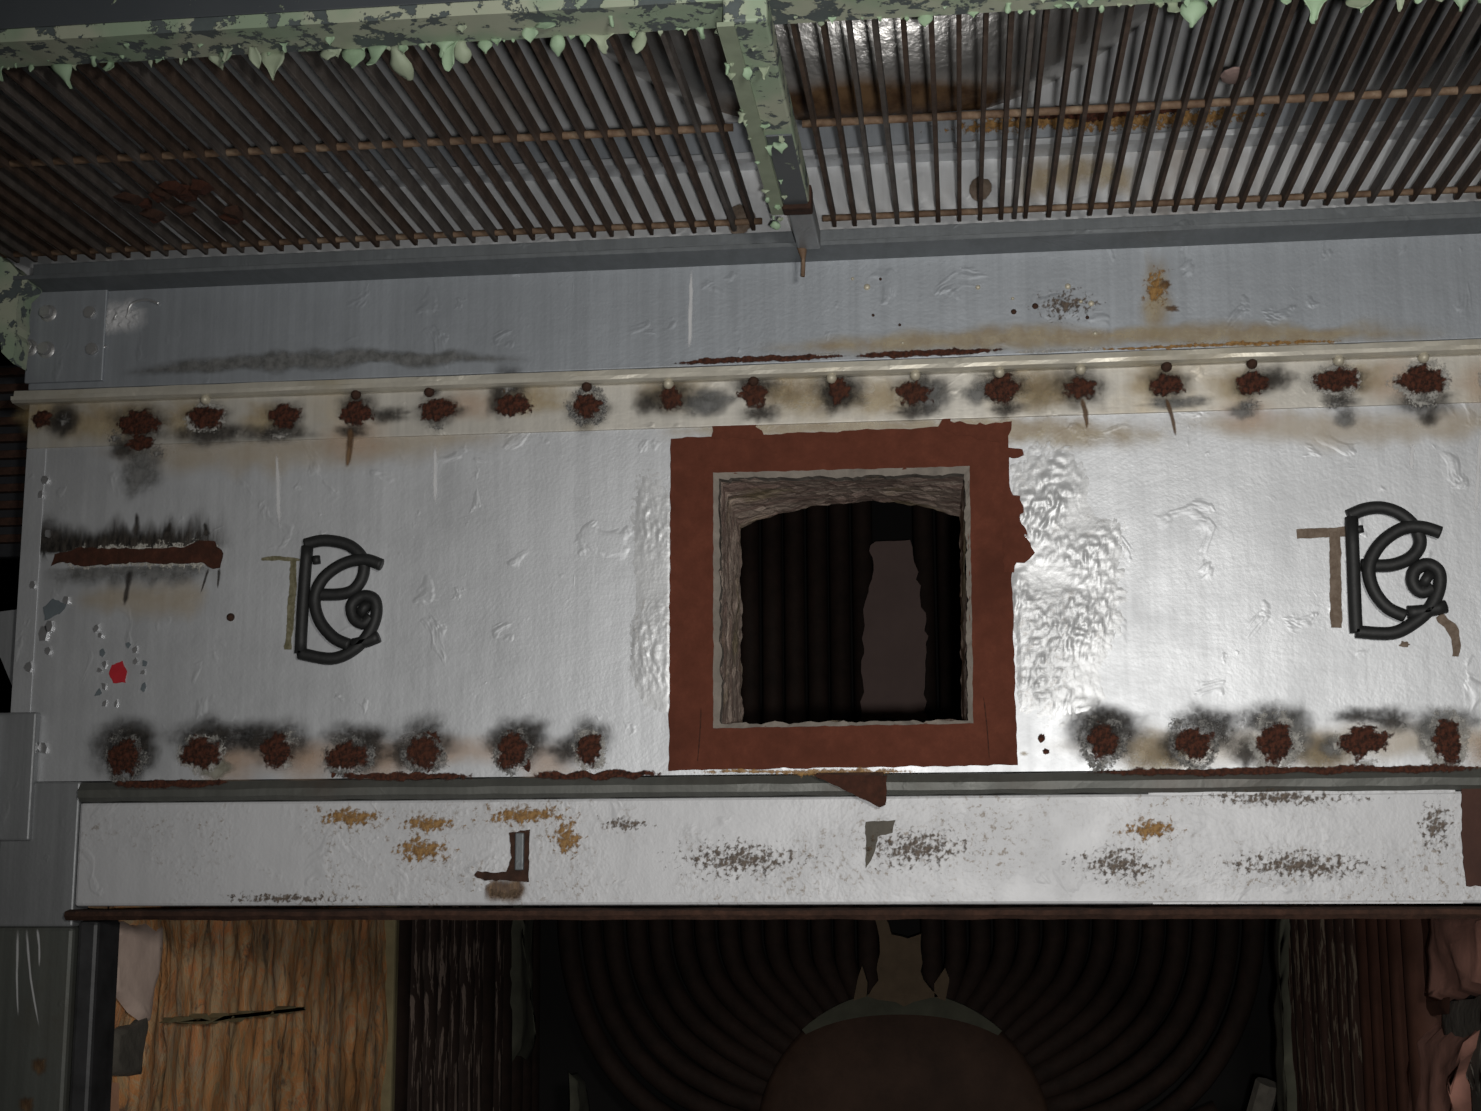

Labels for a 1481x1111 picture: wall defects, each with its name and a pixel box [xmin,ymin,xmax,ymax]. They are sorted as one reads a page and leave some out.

peeling [1005,0,1217,28]
peeling [1280,0,1327,24]
peeling [1345,0,1374,13]
peeling [1396,0,1481,12]
peeling [148,43,288,80]
peeling [306,16,719,81]
rust [638,340,1362,434]
rust [102,725,305,789]
rust [489,723,661,781]
rust [1077,707,1478,806]
rust [316,804,588,863]
rust [1417,789,1481,887]